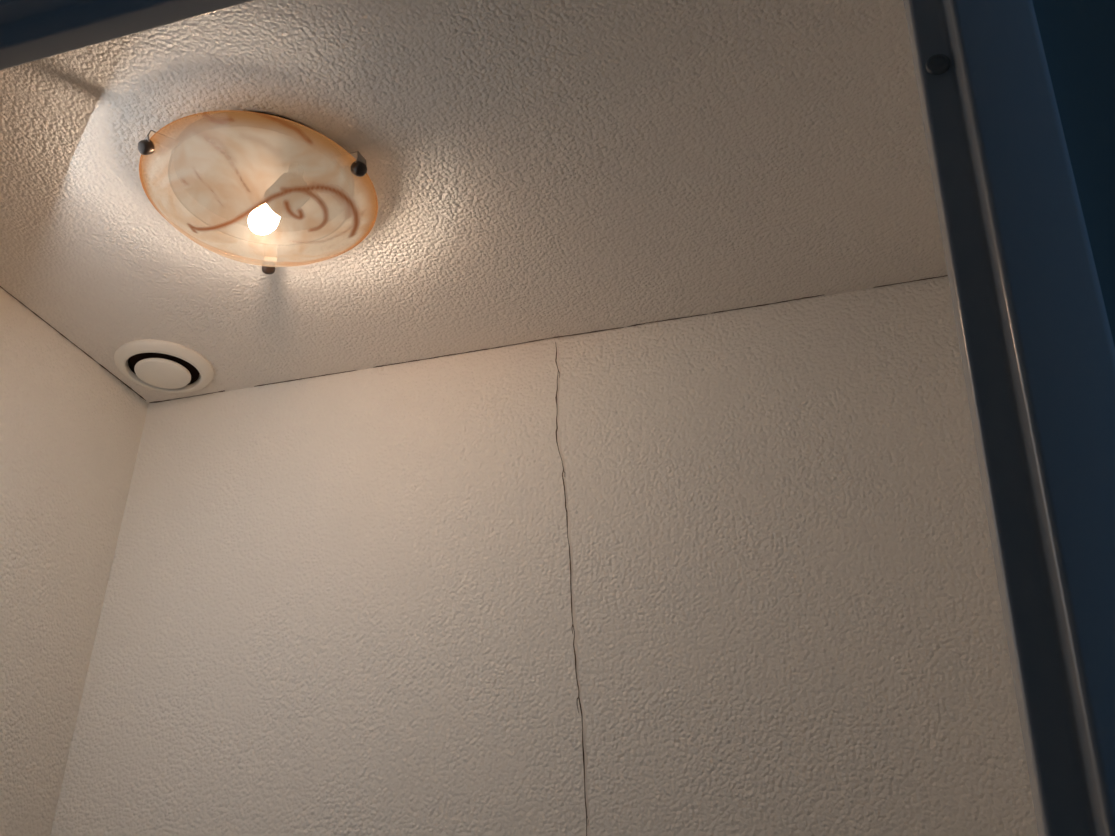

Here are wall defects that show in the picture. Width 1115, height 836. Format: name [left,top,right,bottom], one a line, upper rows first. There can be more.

crack [873,275,948,288]
crack [254,295,822,836]